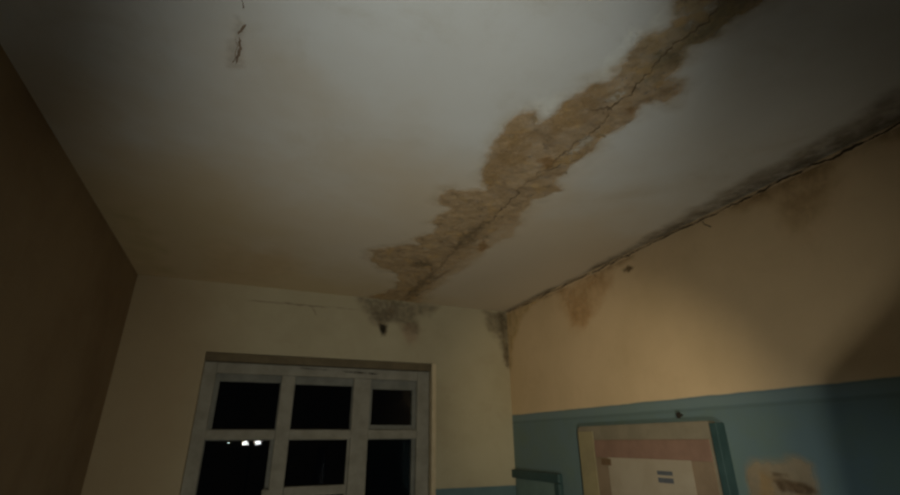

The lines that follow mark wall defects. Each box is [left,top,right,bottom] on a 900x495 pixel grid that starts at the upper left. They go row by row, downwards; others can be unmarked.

crack [232,1,246,64]
leakage [367,0,763,331]
crack [507,122,900,313]
peeling [747,458,817,495]